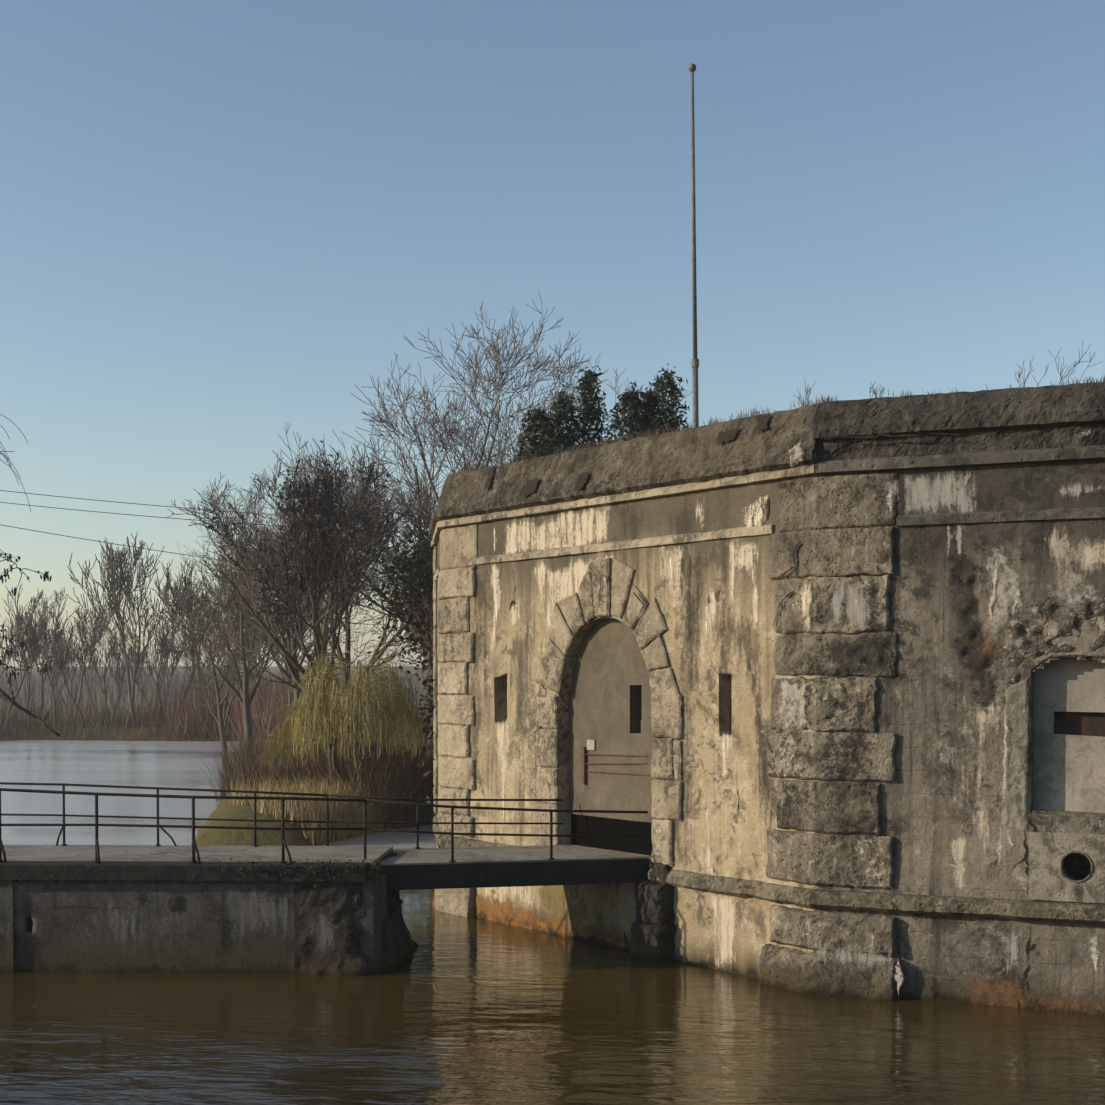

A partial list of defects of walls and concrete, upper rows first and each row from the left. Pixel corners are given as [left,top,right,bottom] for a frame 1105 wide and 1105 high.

leakage [886,473,976,554]
leakage [1044,530,1105,570]
spalling [947,547,1105,862]
rust [475,889,630,948]
crack [1006,817,1036,1008]